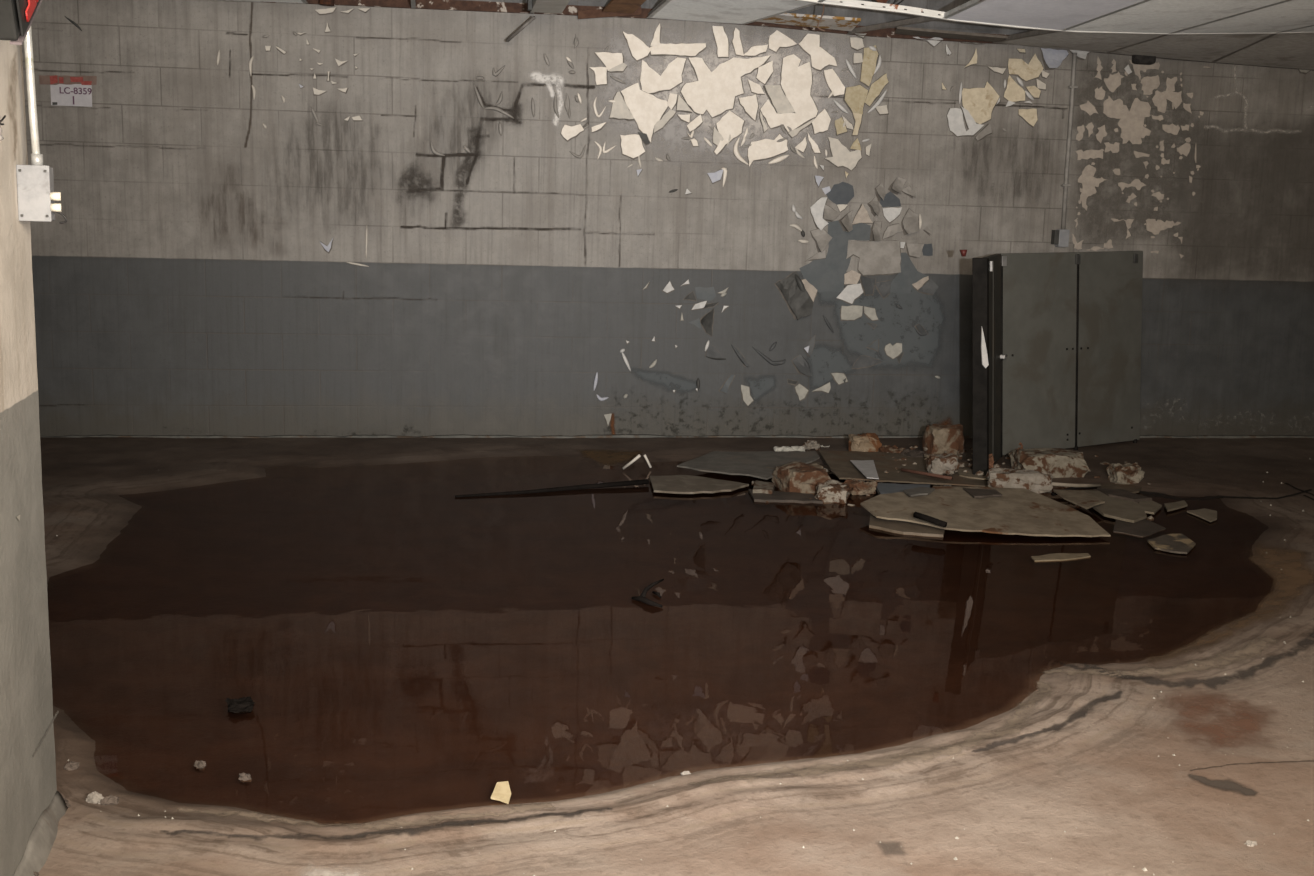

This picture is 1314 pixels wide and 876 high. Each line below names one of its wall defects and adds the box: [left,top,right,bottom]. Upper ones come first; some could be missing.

water stain [401,171,430,194]
water stain [454,130,480,225]
crack [381,65,620,267]
water stain [508,106,520,123]
peeling [553,13,944,407]
peeling [895,26,1290,258]
peeling [593,372,628,435]